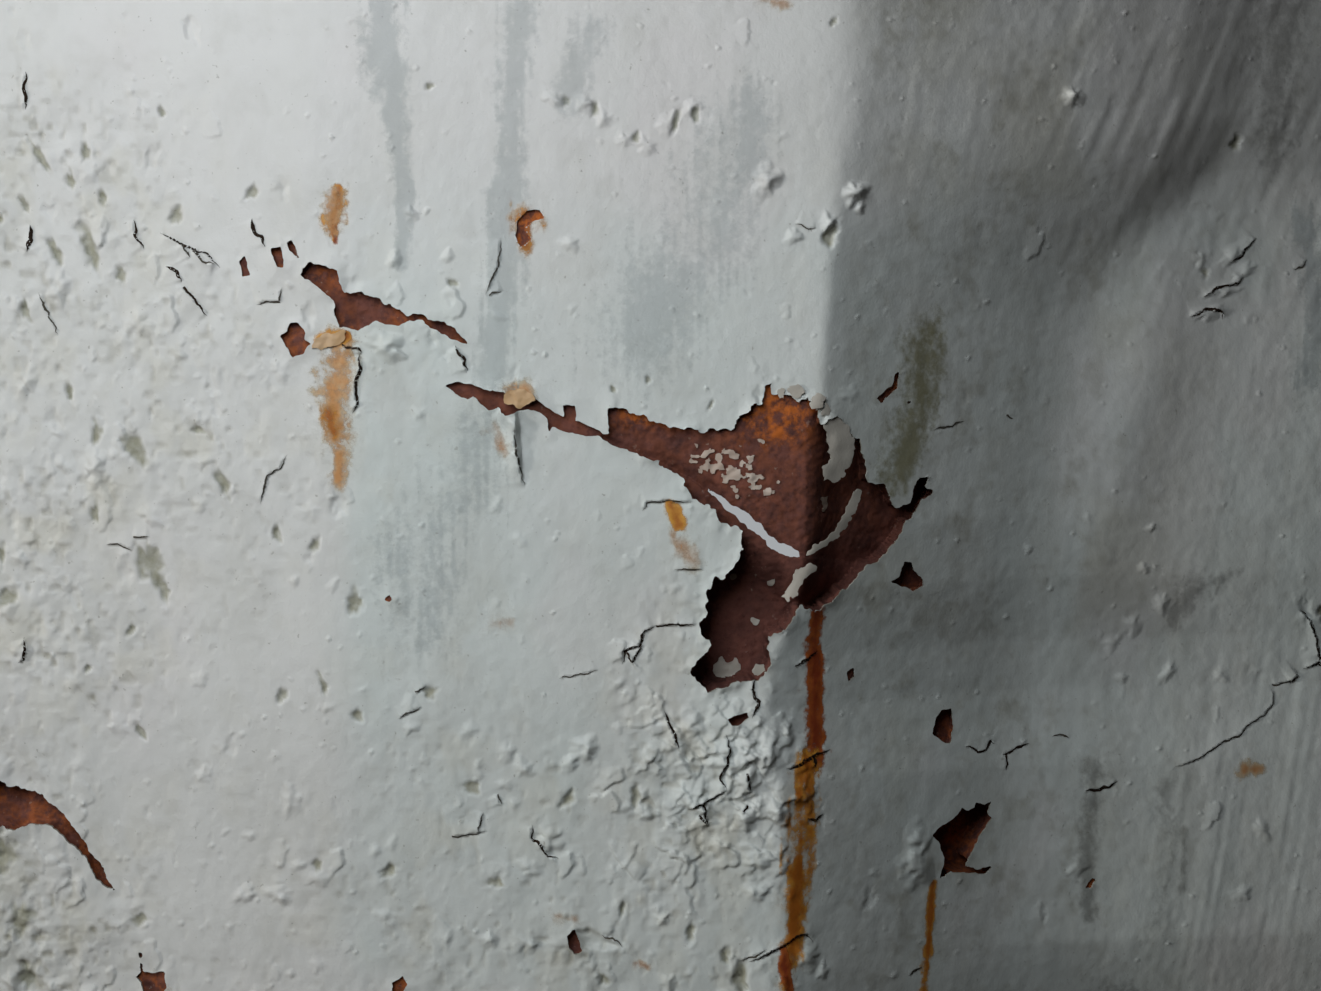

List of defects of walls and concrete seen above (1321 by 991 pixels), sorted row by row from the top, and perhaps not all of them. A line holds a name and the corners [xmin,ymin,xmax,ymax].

corrosion [320,184,348,244]
peeling [515,210,544,247]
peeling [281,323,346,357]
corrosion [311,329,355,490]
peeling [689,439,780,499]
peeling [777,384,855,512]
peeling [767,489,862,602]
crack [561,623,693,678]
crack [1181,611,1321,766]
corrosion [778,607,827,991]
peeling [137,953,166,991]
corrosion [920,880,937,991]